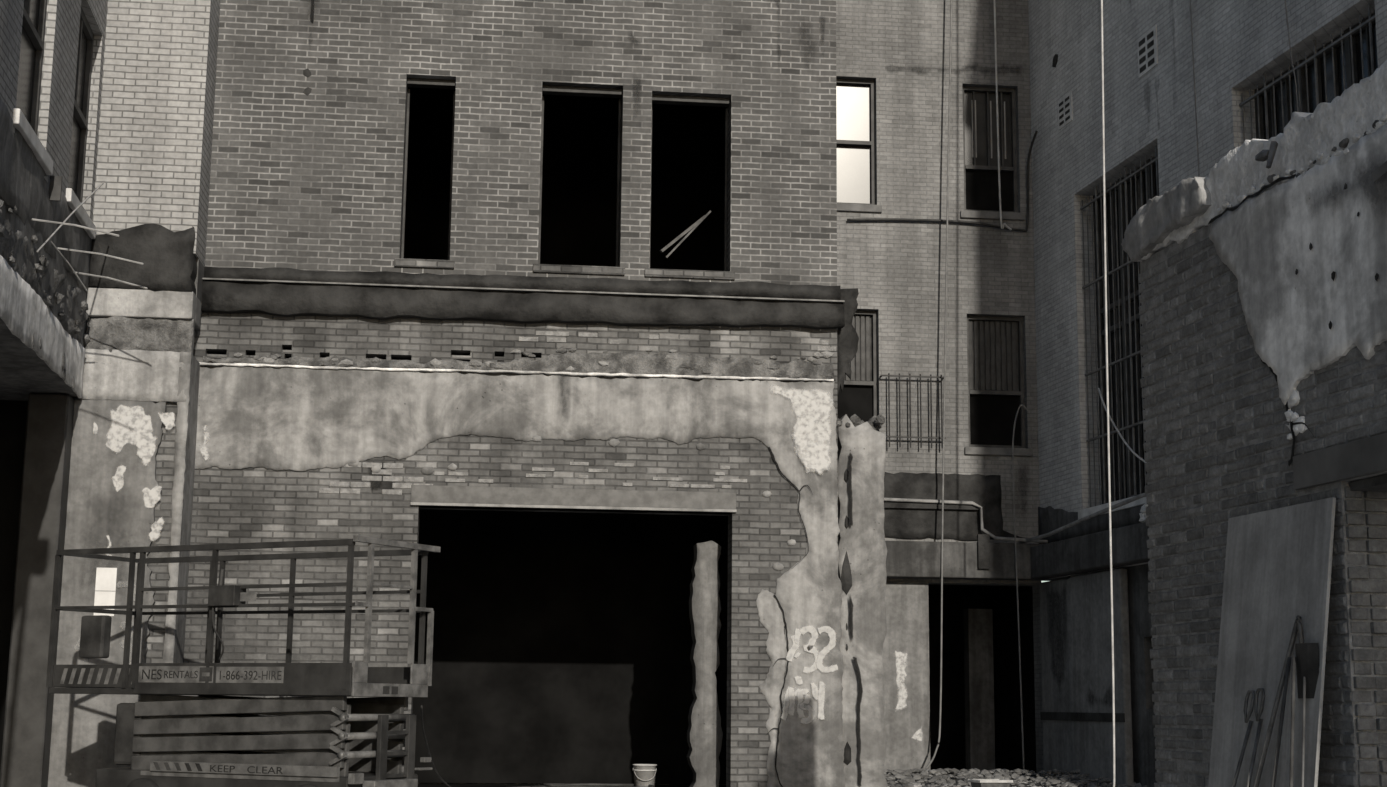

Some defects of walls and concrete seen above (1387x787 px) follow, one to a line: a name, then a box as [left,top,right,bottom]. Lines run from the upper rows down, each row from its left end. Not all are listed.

peeling [1209,114,1387,440]
peeling [0,200,845,787]
crack [768,447,813,564]
crack [846,453,854,526]
crack [768,594,789,787]
crack [849,596,863,786]